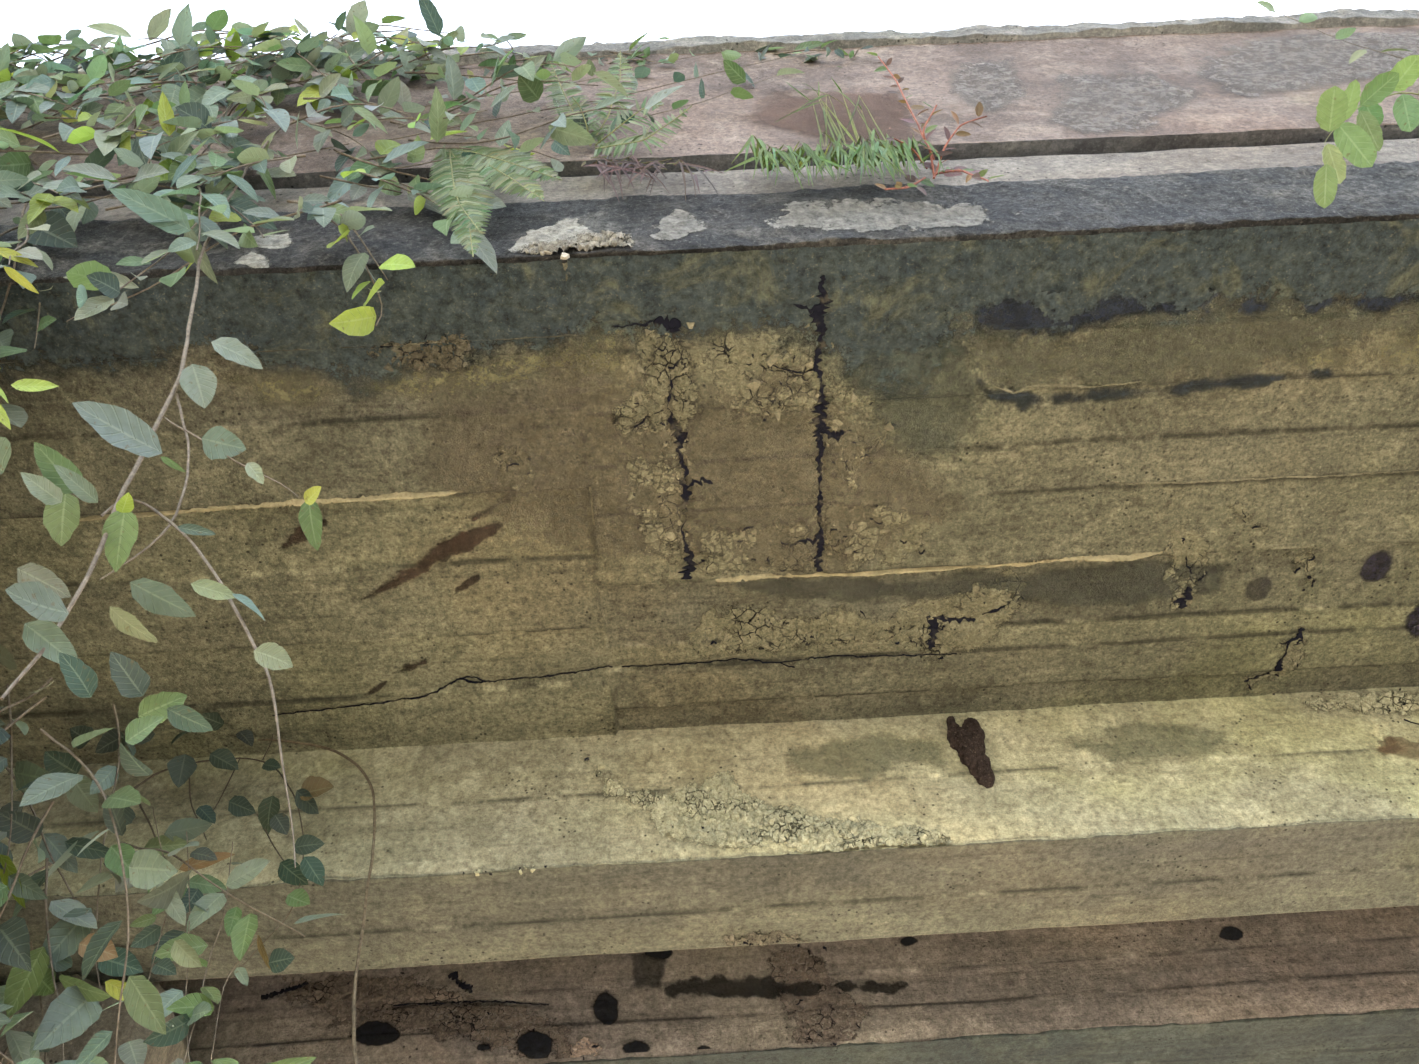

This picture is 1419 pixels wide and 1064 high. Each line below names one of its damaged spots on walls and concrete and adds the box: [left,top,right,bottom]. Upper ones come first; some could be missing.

damp [979,351,1357,412]
crack [613,314,713,580]
damp [364,325,1224,606]
crack [772,275,852,572]
corrosion [361,496,512,600]
damp [1360,551,1393,582]
crack [272,606,1005,716]
crack [1244,627,1305,695]
damp [350,1020,400,1046]
damp [515,1031,553,1059]
damp [593,992,618,1025]
damp [633,950,908,999]